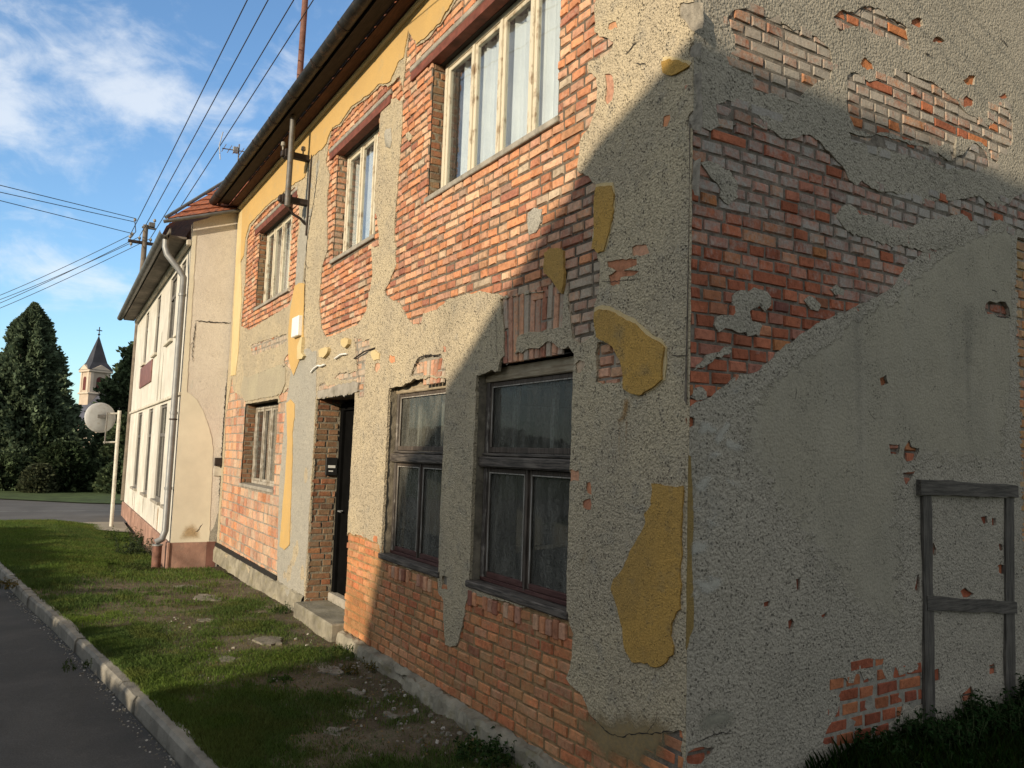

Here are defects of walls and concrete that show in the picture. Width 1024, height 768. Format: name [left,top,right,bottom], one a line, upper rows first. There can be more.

spalling [209,0,667,602]
peeling [661,2,1024,642]
spalling [344,533,712,768]
peeling [610,455,694,667]
spalling [823,658,922,746]